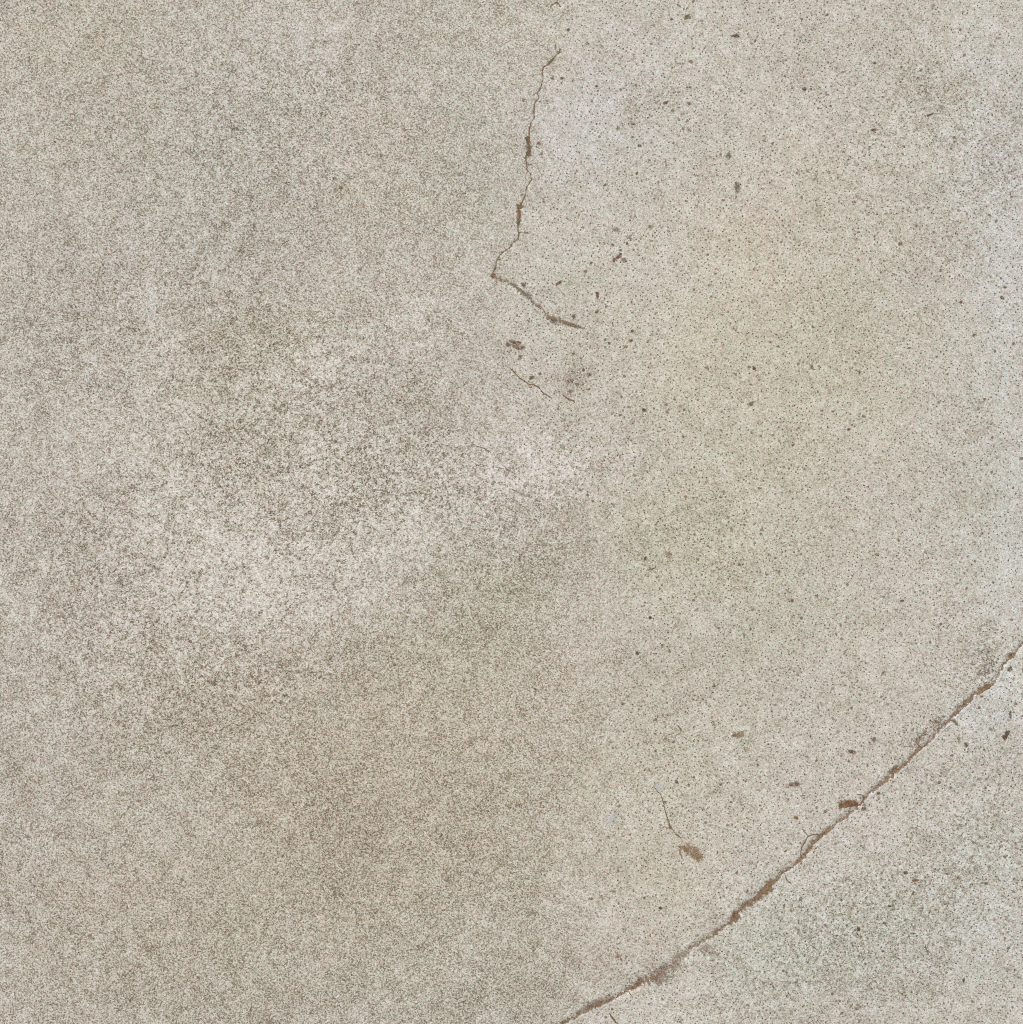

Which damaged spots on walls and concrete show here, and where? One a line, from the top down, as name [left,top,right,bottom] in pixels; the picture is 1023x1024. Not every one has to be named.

crack [491,44,583,328]
crack [655,788,682,858]
crack [685,643,1023,954]
crack [562,972,659,1024]